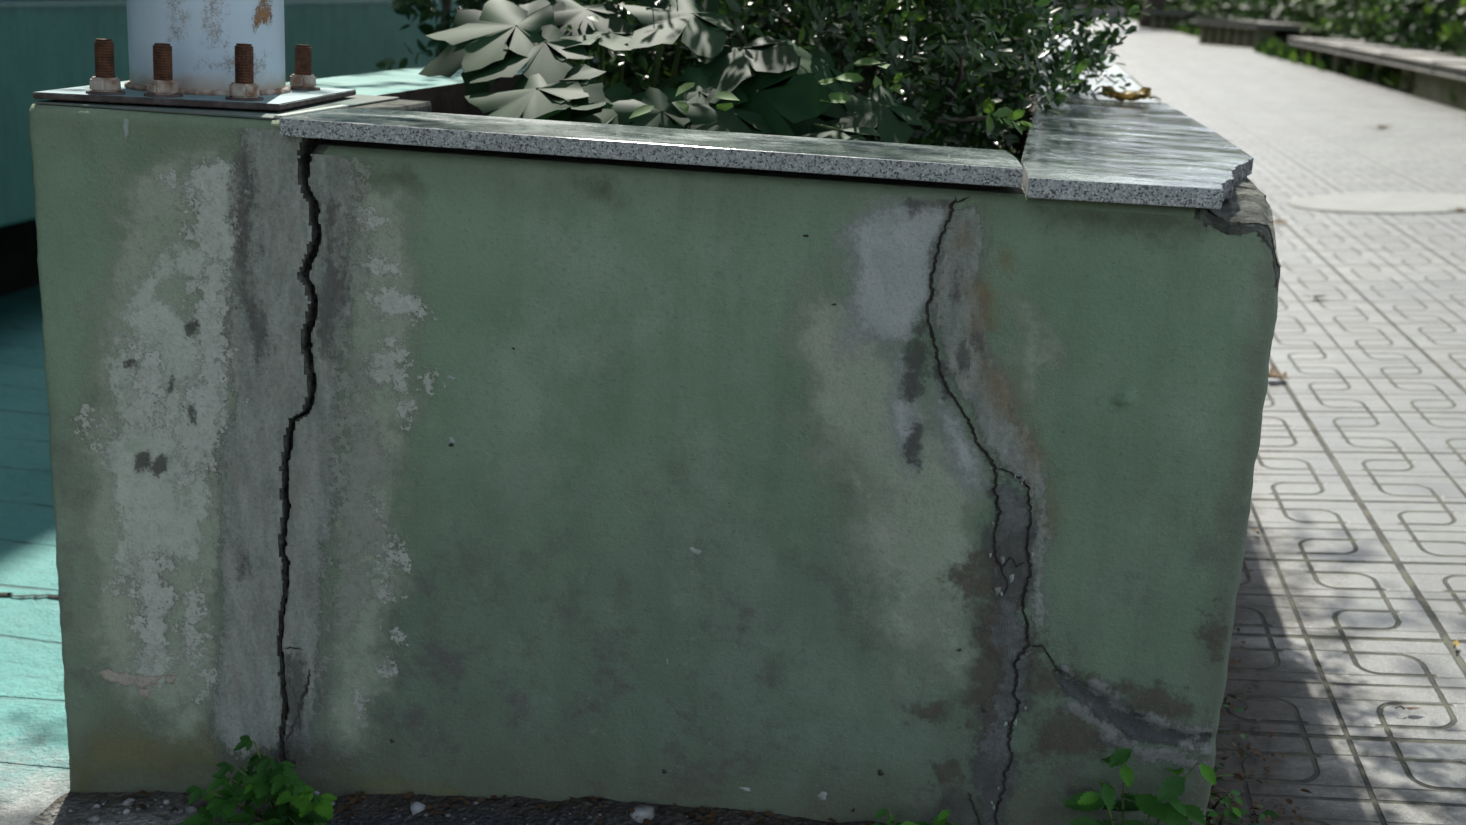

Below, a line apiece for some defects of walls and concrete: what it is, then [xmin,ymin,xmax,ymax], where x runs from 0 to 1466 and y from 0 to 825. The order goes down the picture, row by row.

rust [252,0,273,31]
peeling [70,127,455,760]
crack [278,138,327,763]
peeling [906,199,1057,825]
crack [925,196,1058,825]
water stain [904,550,1195,773]
spalling [1053,664,1215,772]
spalling [1199,176,1282,287]